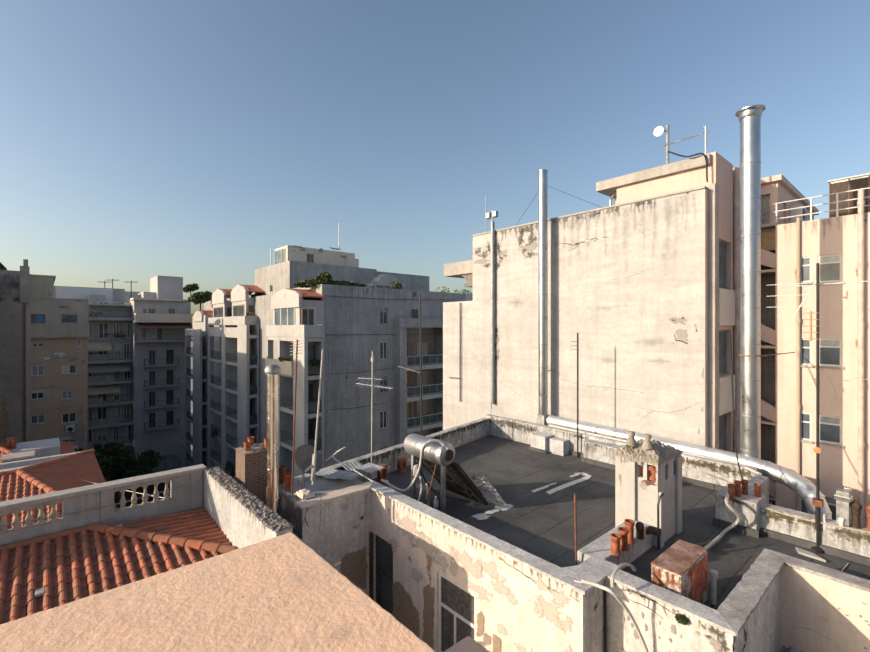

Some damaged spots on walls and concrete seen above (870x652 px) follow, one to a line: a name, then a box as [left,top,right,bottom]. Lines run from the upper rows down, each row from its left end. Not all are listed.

crack [562,237,606,251]
spalling [669,317,698,344]
peeling [387,504,518,605]
peeling [529,578,573,633]
peeling [398,607,414,632]
crack [732,629,749,652]